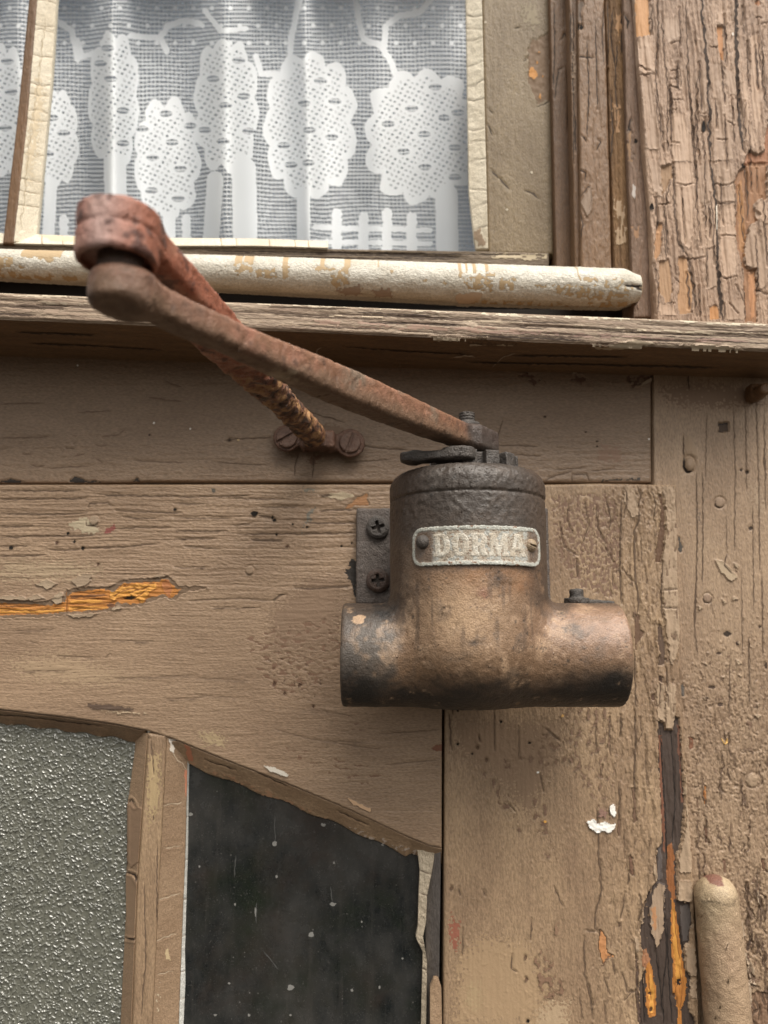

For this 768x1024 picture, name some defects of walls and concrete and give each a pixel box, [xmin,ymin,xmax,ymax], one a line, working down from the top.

peeling [313,258,351,288]
crack [207,0,768,389]
peeling [528,33,550,104]
peeling [457,253,634,308]
peeling [610,0,768,323]
peeling [0,563,205,619]
crack [498,403,768,1024]
peeling [504,485,768,1024]